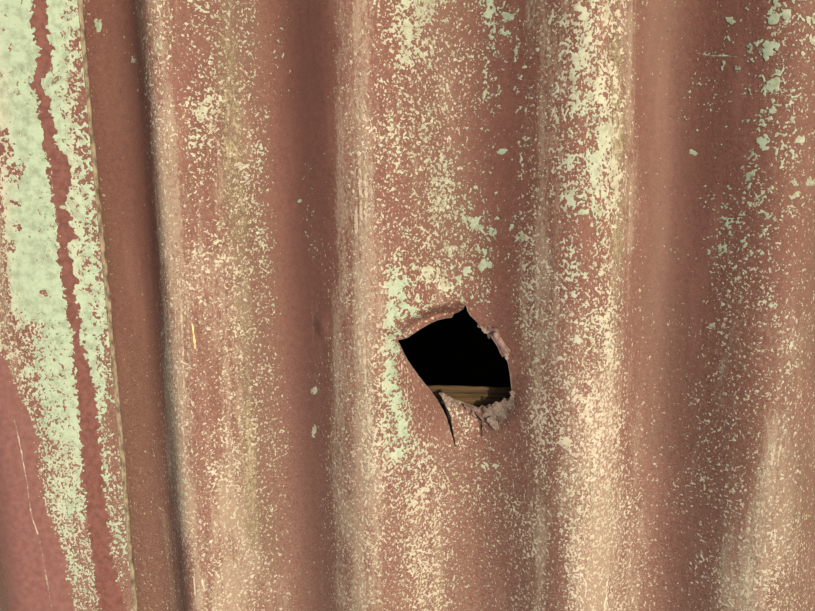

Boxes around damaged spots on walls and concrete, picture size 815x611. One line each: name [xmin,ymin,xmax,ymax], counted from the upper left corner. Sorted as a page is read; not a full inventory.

peeling [133,0,293,611]
peeling [297,0,670,611]
peeling [664,0,815,611]